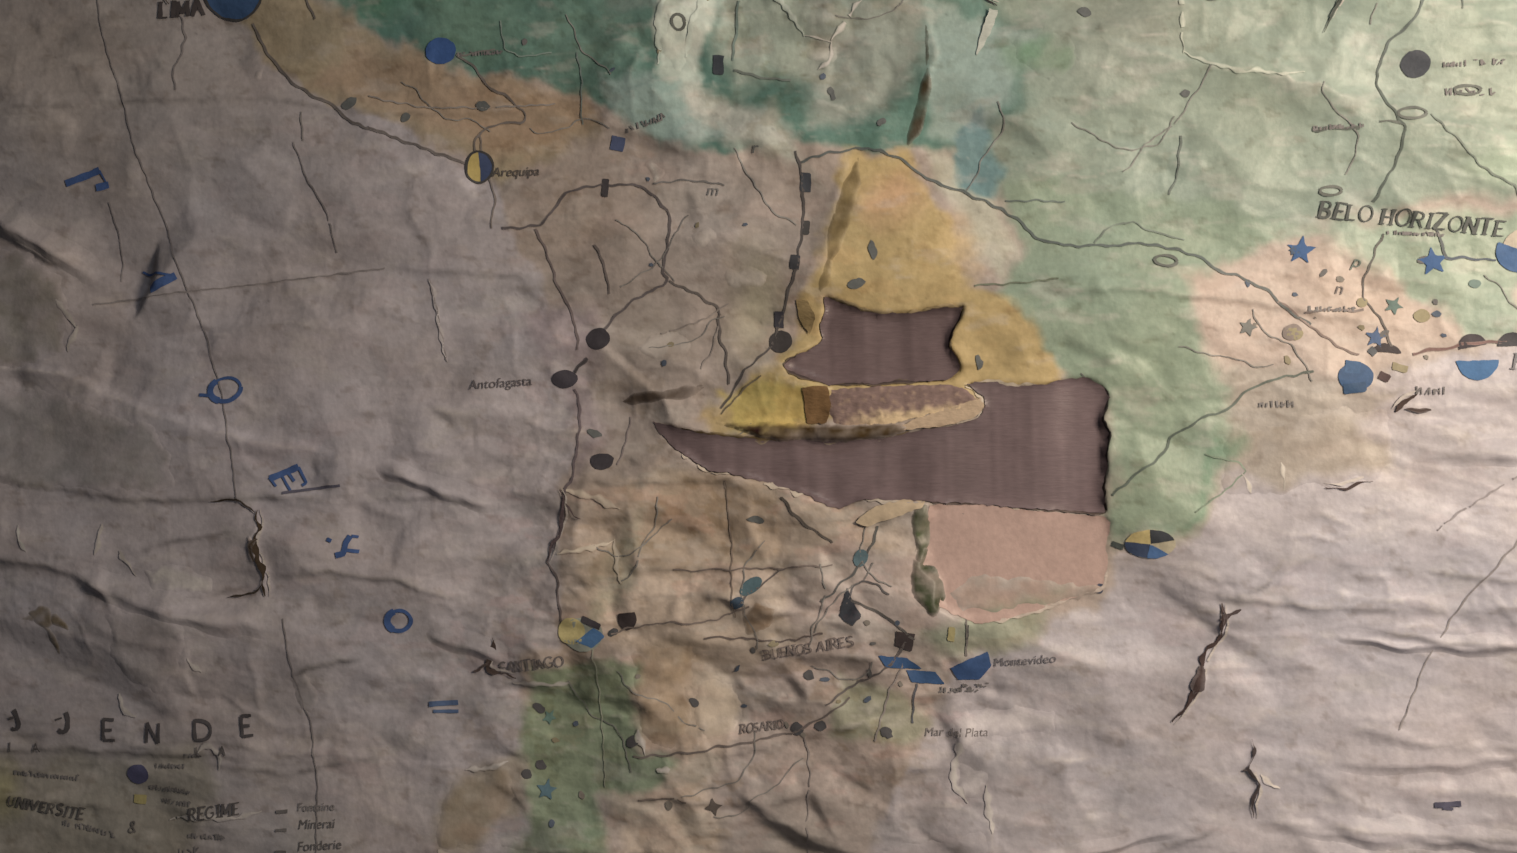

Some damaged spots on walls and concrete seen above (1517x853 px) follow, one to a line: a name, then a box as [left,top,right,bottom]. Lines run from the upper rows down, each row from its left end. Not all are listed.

peeling [724,266,767,288]
peeling [638,331,691,360]
peeling [654,297,1112,624]